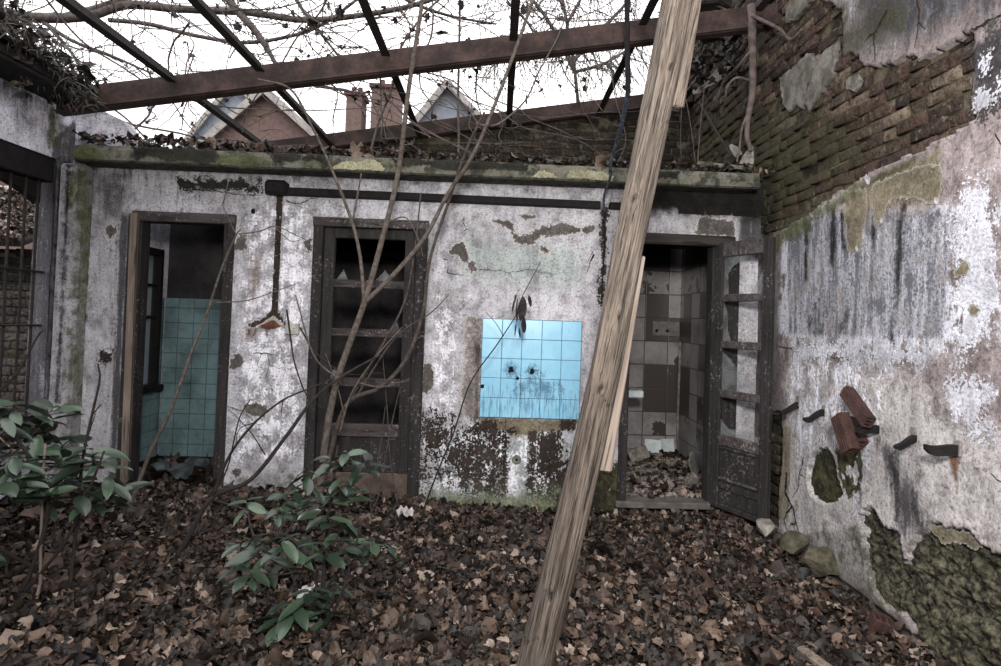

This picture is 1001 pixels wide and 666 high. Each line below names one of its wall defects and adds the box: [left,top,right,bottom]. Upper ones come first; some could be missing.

peeling [447,241,479,274]
peeling [491,213,597,255]
leakage [830,208,846,267]
flaking render [678,0,1001,456]
leakage [893,202,906,308]
flaking render [864,509,1001,666]